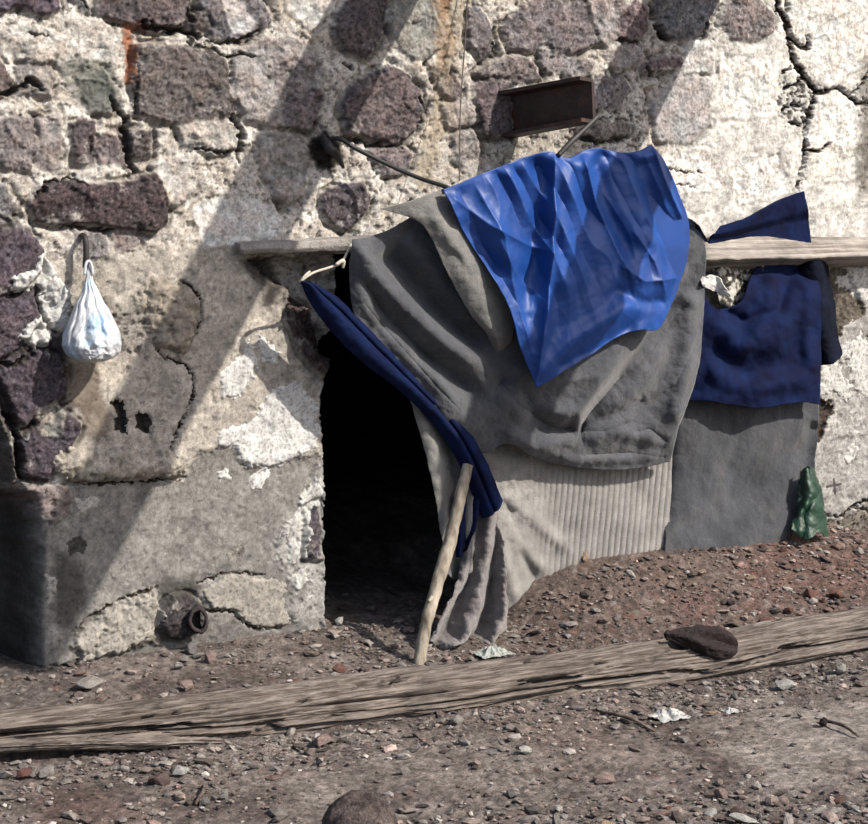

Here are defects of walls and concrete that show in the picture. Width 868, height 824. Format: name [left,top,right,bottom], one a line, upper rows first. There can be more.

rust [122,21,149,84]
crack [774,0,868,186]
flaking render [109,399,152,435]
crack [155,346,195,447]
flaking render [219,333,281,400]
flaking render [216,381,321,490]
flaking render [817,266,868,443]
flaking render [844,438,860,465]
crack [827,499,868,518]
crack [198,571,257,584]
crack [75,588,152,632]
crack [205,609,277,631]